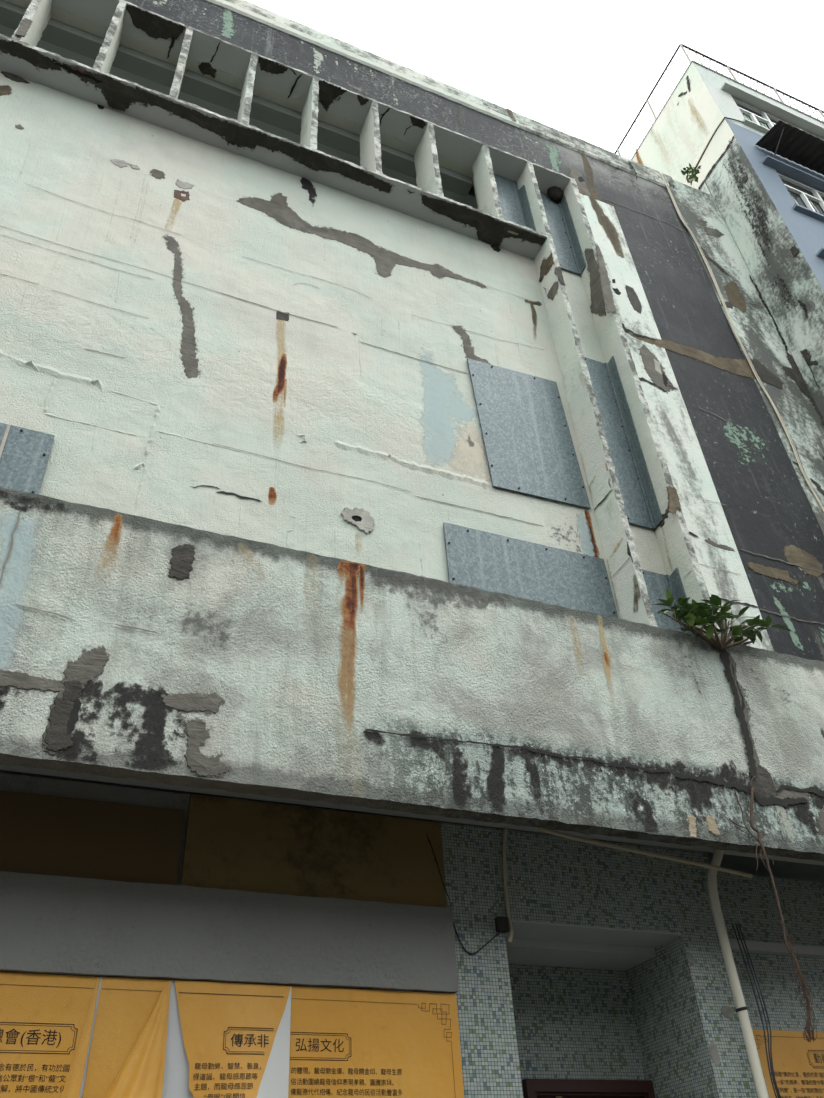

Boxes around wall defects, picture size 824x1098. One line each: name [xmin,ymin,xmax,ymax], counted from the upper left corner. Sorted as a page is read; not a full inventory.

spalling [258,57,302,99]
spalling [318,80,369,111]
rust [273,320,287,436]
peeling [639,344,676,394]
flaking render [782,351,824,425]
rust [268,487,277,504]
rust [338,561,366,718]
mould [57,680,187,771]
leakage [363,730,385,745]
leakage [409,730,472,807]
crack [365,650,824,807]
leakage [487,743,749,832]